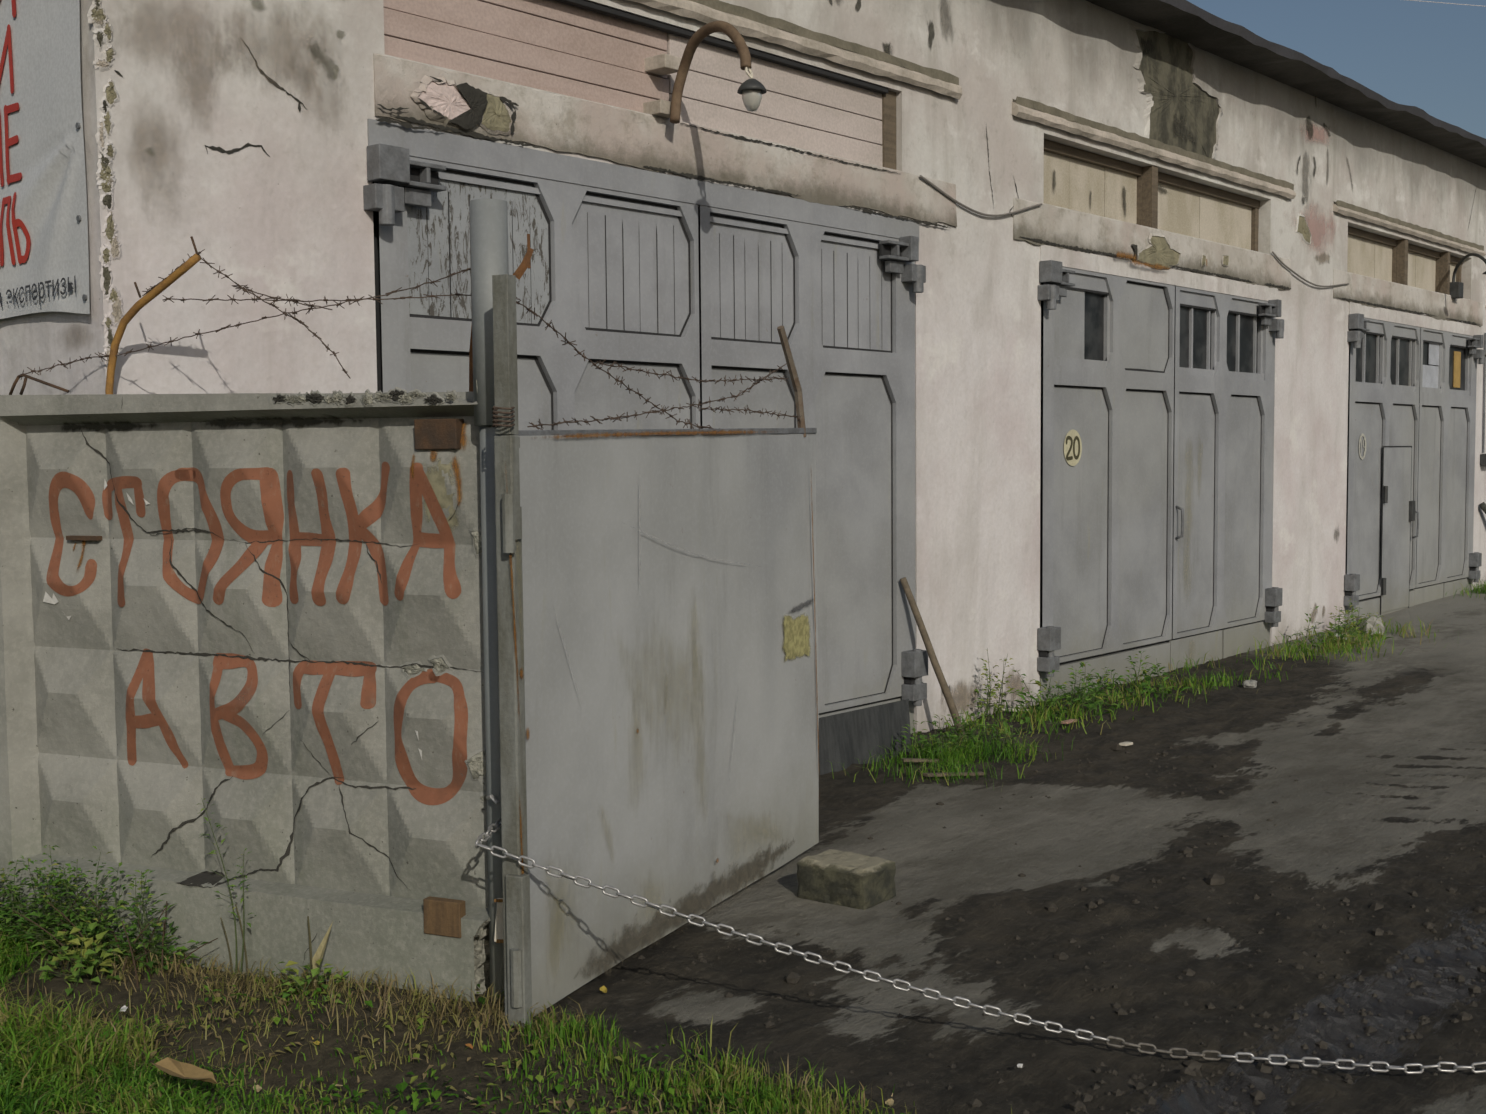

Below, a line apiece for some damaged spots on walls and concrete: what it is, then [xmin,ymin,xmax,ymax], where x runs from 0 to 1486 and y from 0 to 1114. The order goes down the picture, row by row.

crack [240,38,305,112]
spalling [448,82,513,136]
spalling [1129,23,1223,166]
crack [205,143,269,156]
crack [81,430,478,888]